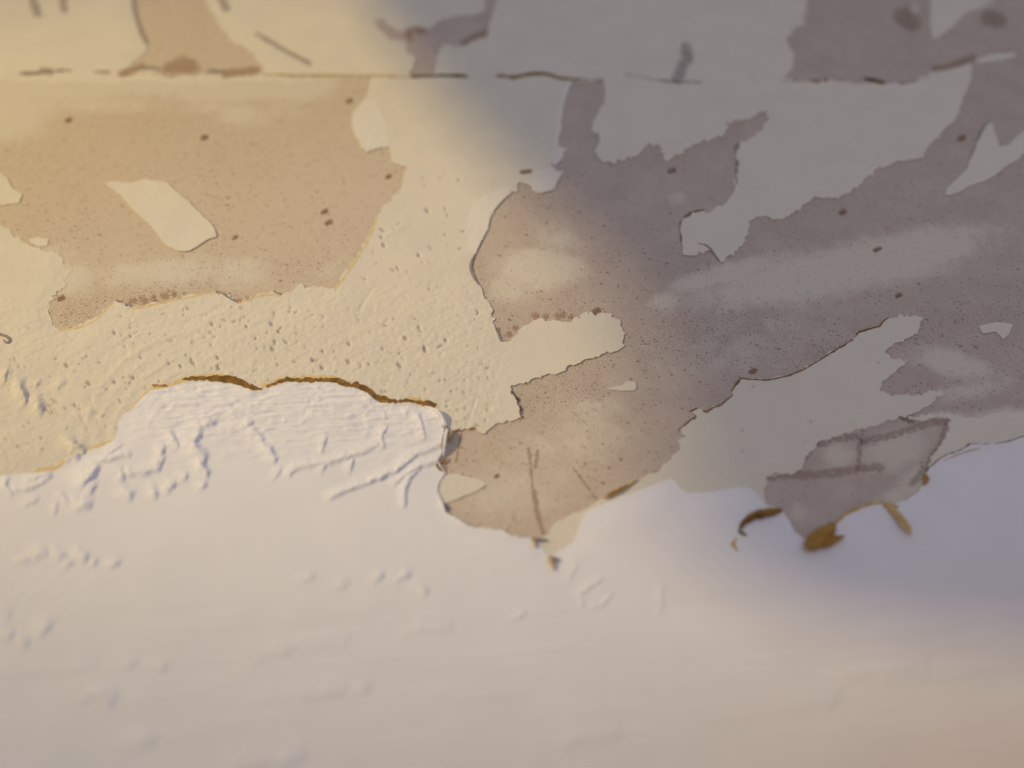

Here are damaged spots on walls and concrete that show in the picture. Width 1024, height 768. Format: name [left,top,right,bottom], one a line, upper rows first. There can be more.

peeling [0,0,408,331]
peeling [425,0,1024,543]